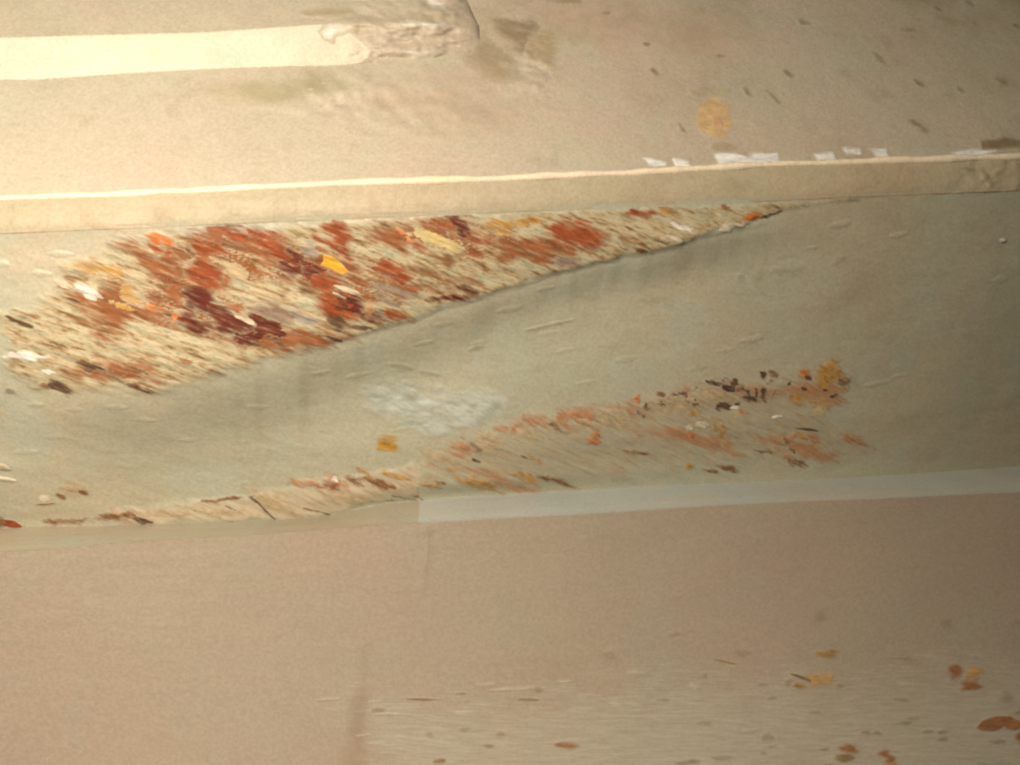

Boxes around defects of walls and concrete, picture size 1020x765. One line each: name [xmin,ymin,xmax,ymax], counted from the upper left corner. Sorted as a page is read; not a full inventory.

peeling [318,20,352,45]
rust [687,83,738,153]
rust [368,356,877,502]
rust [0,463,18,483]
rust [0,511,27,528]
rust [792,646,844,693]
rust [939,659,990,694]
rust [973,713,1020,752]
rust [829,740,902,765]